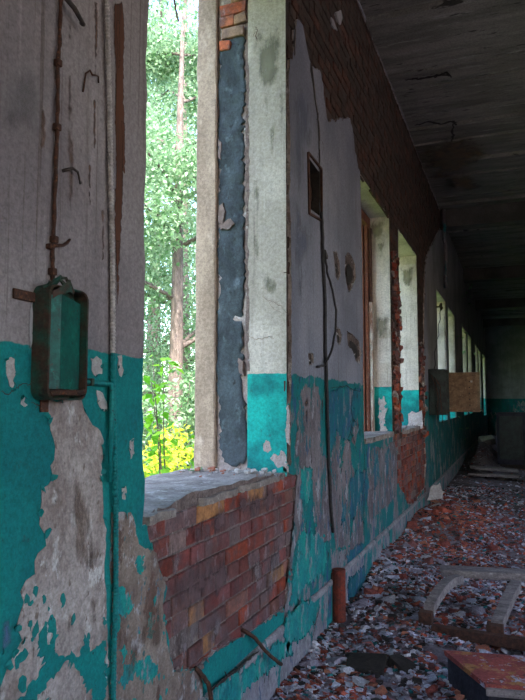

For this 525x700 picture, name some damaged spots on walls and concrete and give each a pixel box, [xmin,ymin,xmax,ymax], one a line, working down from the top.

corrosion [114,2,126,304]
damp [260,38,279,84]
flaking render [285,0,441,524]
crack [405,72,452,81]
peeling [0,210,364,700]